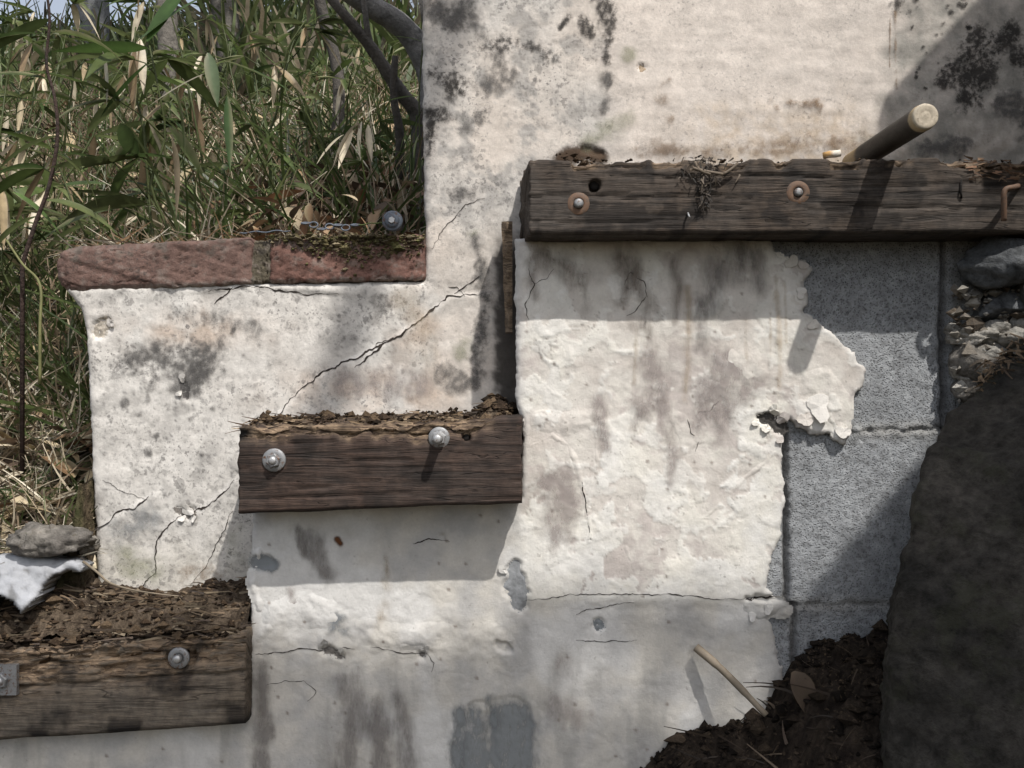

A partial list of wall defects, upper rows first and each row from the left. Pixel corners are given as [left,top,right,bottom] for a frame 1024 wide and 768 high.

mould [425,68,466,155]
mould [415,0,555,92]
mould [558,0,617,113]
mould [914,21,1024,128]
crack [208,285,338,304]
peeling [770,252,809,306]
crack [280,276,479,414]
peeling [752,365,854,443]
crack [93,480,149,531]
crack [143,480,234,586]
peeling [498,559,529,613]
crack [526,593,777,615]